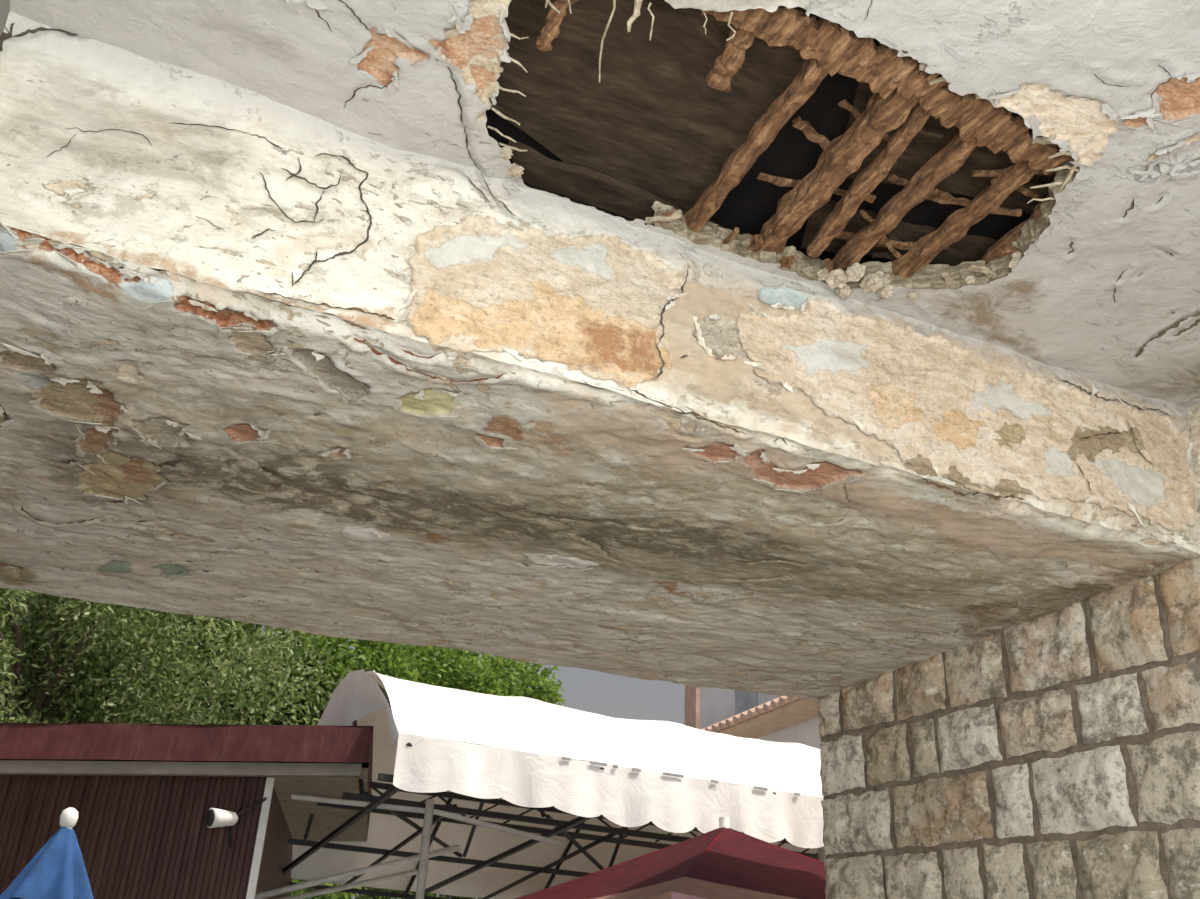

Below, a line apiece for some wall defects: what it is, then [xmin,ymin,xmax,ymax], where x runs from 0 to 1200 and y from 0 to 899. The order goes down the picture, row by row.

crack [0,23,77,51]
crack [47,128,151,157]
spalling [349,0,512,122]
spalling [987,73,1200,184]
spalling [0,221,370,404]
crack [175,123,507,382]
spalling [399,215,688,396]
spalling [0,343,202,504]
spalling [682,282,1200,531]
crack [1059,378,1170,416]